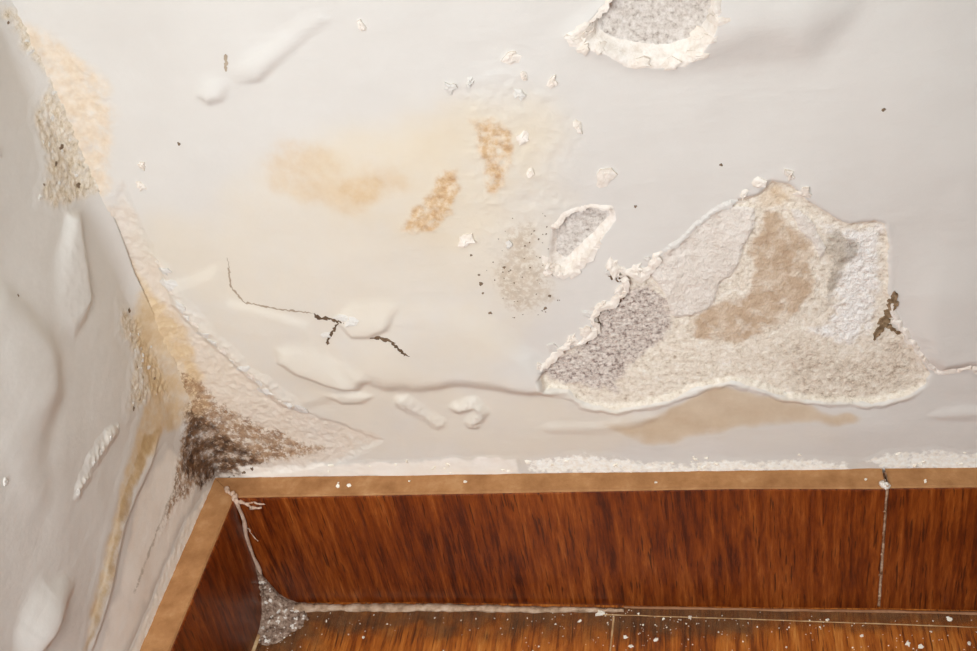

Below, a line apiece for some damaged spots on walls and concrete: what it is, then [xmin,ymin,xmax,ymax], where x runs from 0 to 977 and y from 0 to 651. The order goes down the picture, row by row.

water stain [17,11,131,205]
water stain [240,44,599,332]
peeling [564,0,731,71]
crack [227,259,344,345]
crack [370,336,410,357]
peeling [533,176,977,416]
crack [873,291,901,341]
water stain [95,360,977,651]